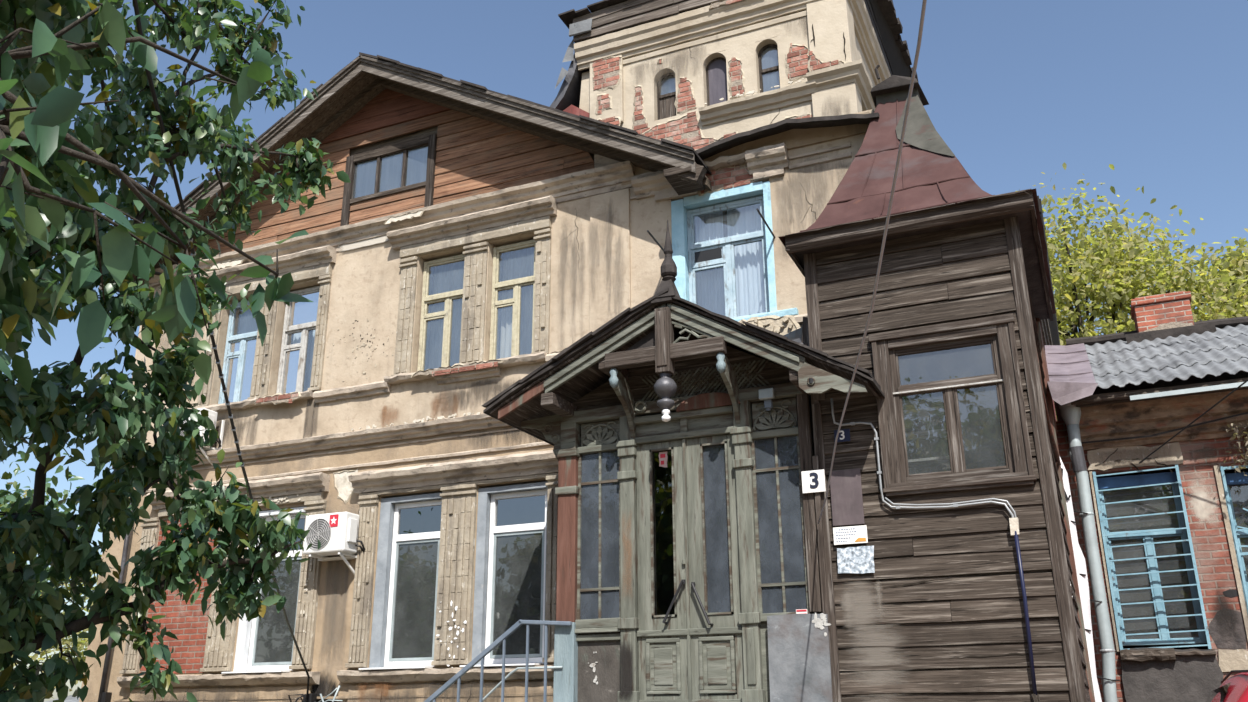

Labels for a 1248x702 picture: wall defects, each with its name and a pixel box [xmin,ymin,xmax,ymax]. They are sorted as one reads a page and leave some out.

spalling [592,43,845,150]
spalling [698,164,753,196]